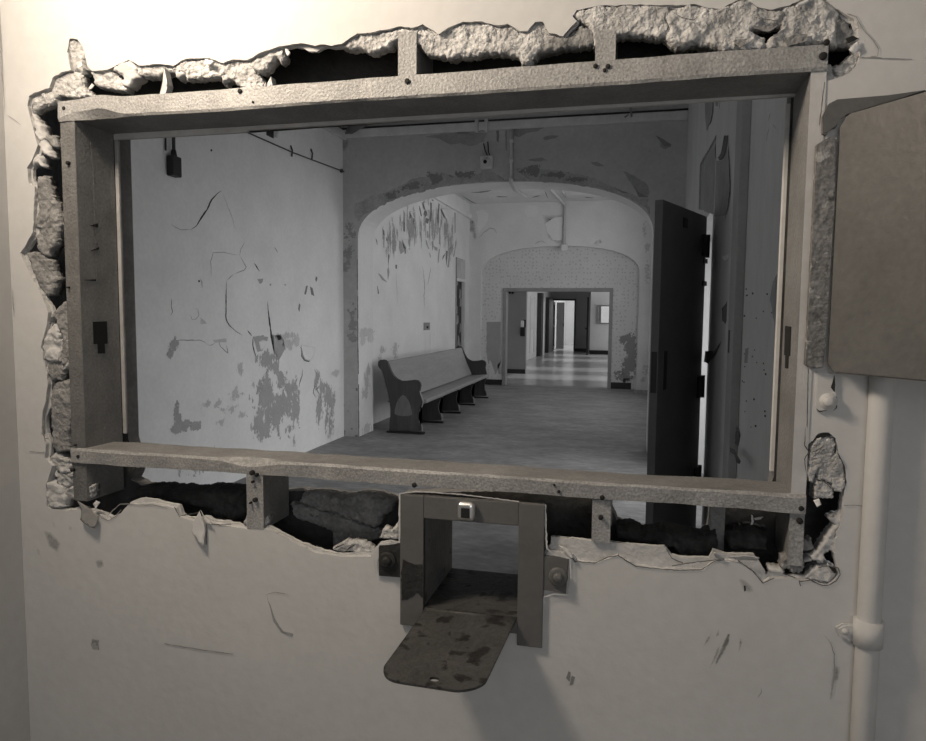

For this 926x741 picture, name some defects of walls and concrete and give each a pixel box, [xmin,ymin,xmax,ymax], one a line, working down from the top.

spalling [343,0,879,81]
peeling [345,125,368,134]
peeling [425,128,558,151]
peeling [699,102,730,217]
spalling [27,40,290,546]
crack [174,191,259,334]
crack [267,303,279,354]
peeling [201,331,372,447]
peeling [343,157,650,294]
peeling [704,342,721,364]
peeling [559,545,725,571]
spalling [738,433,846,586]